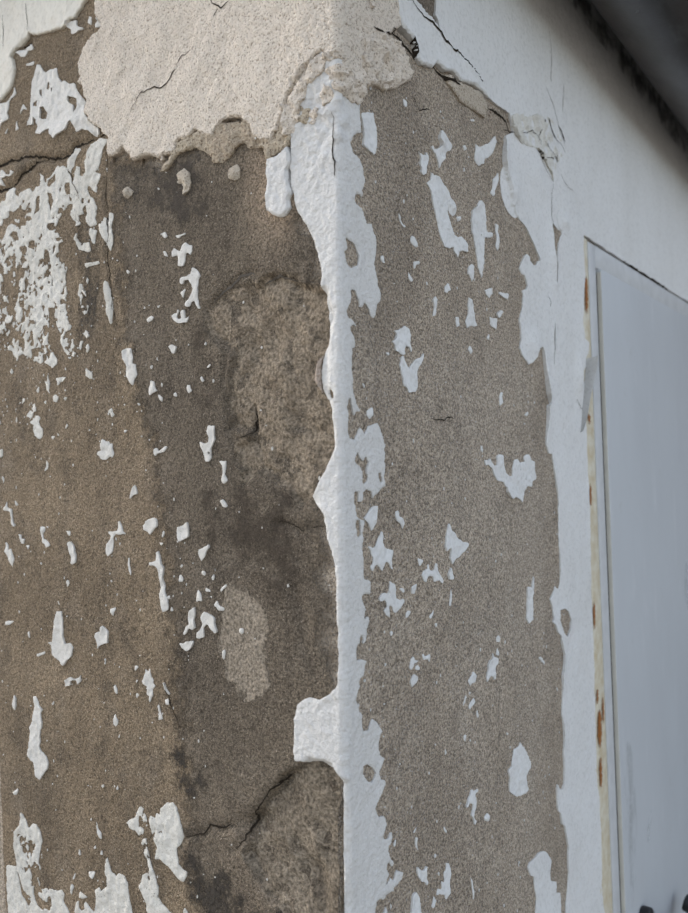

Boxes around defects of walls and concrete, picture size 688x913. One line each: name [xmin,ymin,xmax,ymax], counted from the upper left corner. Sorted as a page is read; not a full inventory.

crack [375,1,483,85]
water stain [121,154,206,222]
crack [487,90,574,223]
peeling [344,239,358,268]
peeling [0,0,351,913]
peeling [347,0,570,913]
corrosion [596,690,605,747]
mould [169,746,207,797]
crack [185,772,296,849]
water stain [182,854,243,913]